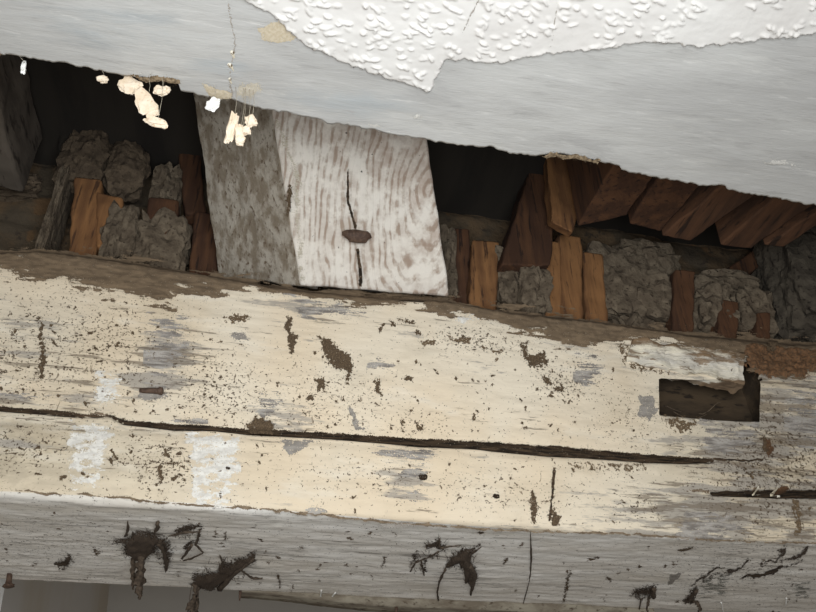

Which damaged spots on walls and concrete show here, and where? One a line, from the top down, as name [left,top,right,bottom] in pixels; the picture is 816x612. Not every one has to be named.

peeling [246,0,816,93]
peeling [96,71,181,129]
peeling [201,83,258,146]
spalling [283,183,293,217]
crack [346,171,363,287]
peeling [283,293,366,323]
crack [36,320,48,382]
peeling [131,312,208,425]
peeling [535,349,614,404]
peeling [637,395,658,422]
peeling [372,446,434,512]
crack [0,406,816,587]